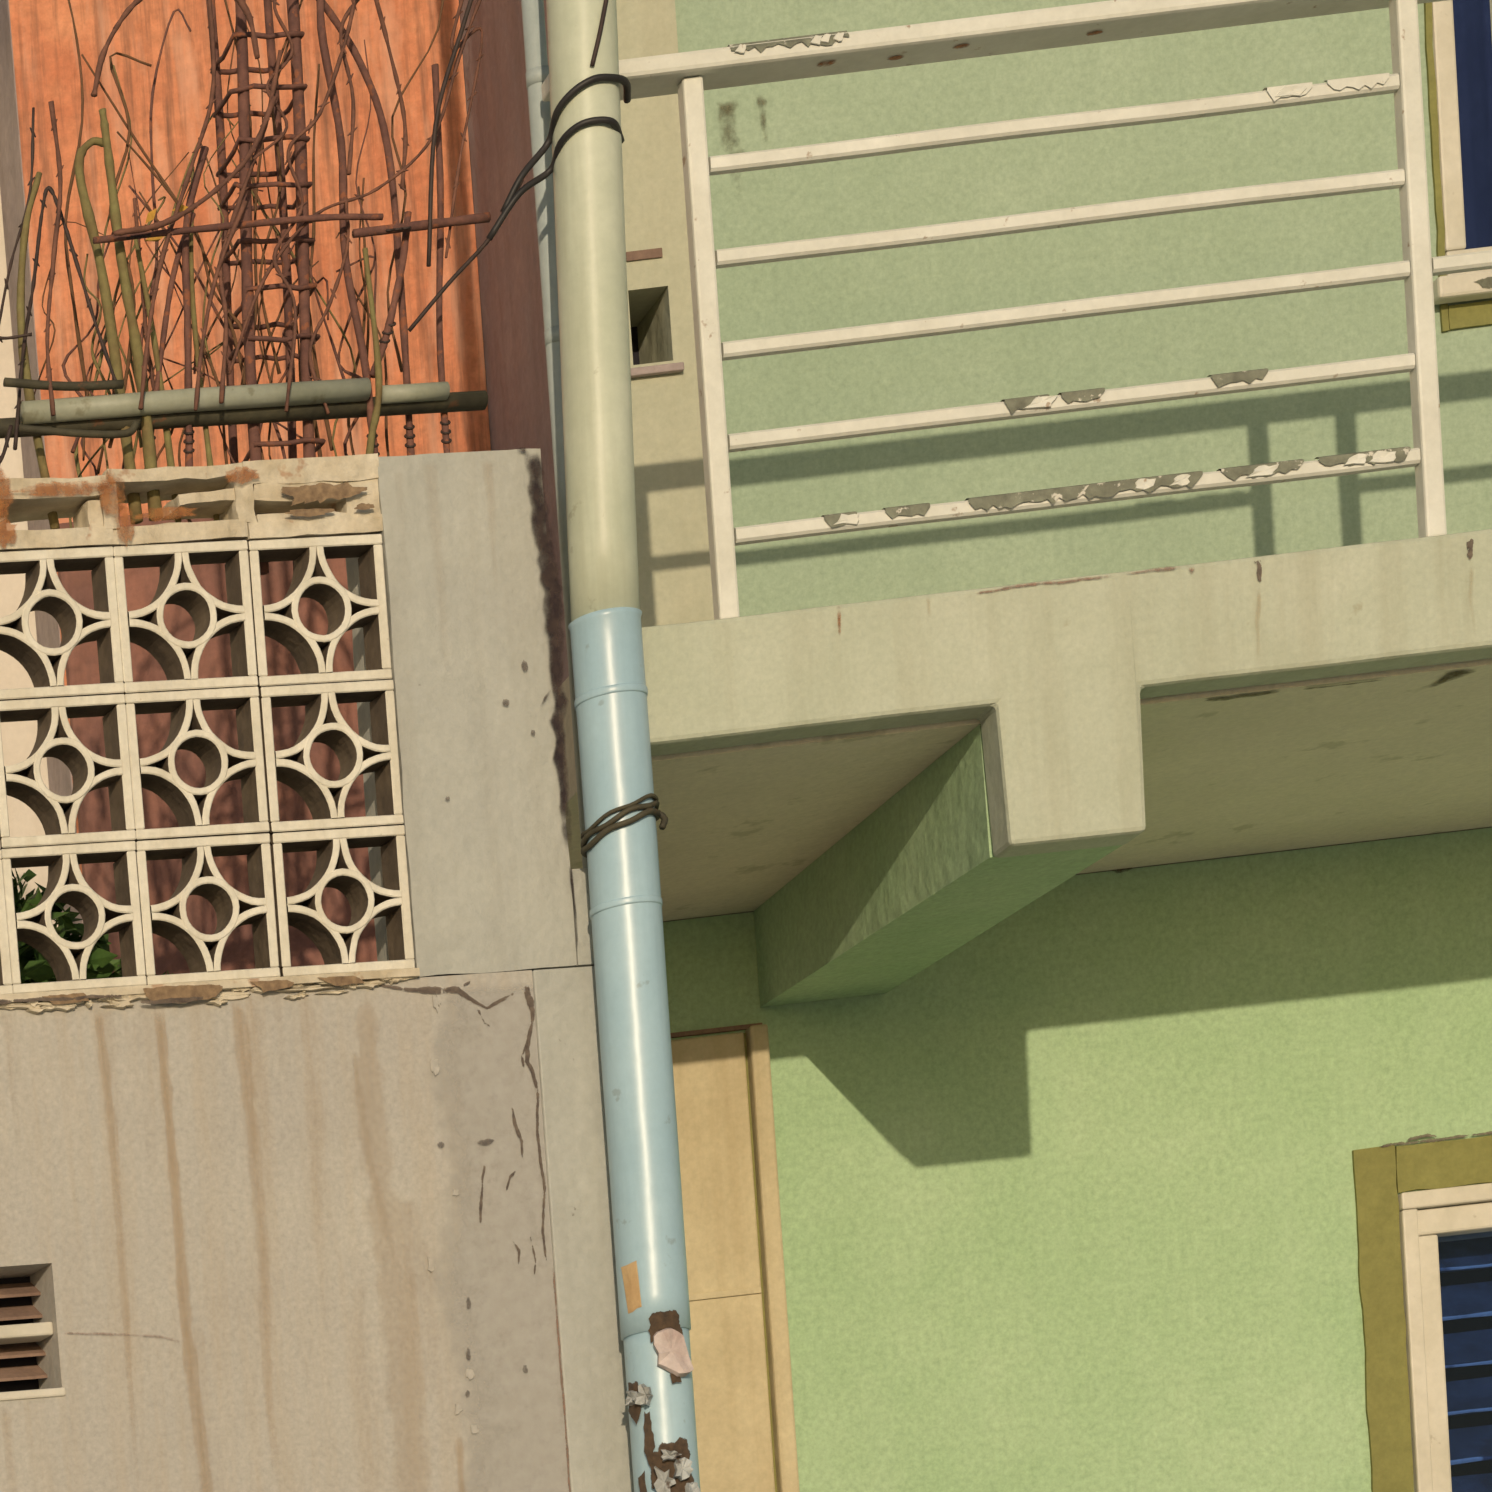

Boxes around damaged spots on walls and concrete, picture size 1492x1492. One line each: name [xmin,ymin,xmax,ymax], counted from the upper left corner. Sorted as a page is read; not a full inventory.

peeling [727,30,849,54]
peeling [1475,277,1492,288]
peeling [1207,368,1268,388]
peeling [1001,388,1105,414]
rust [226,467,259,484]
peeling [964,446,1410,510]
rust [0,469,194,547]
peeling [821,511,859,527]
peeling [882,503,930,519]
spalling [0,976,414,1014]
crack [368,981,571,1492]